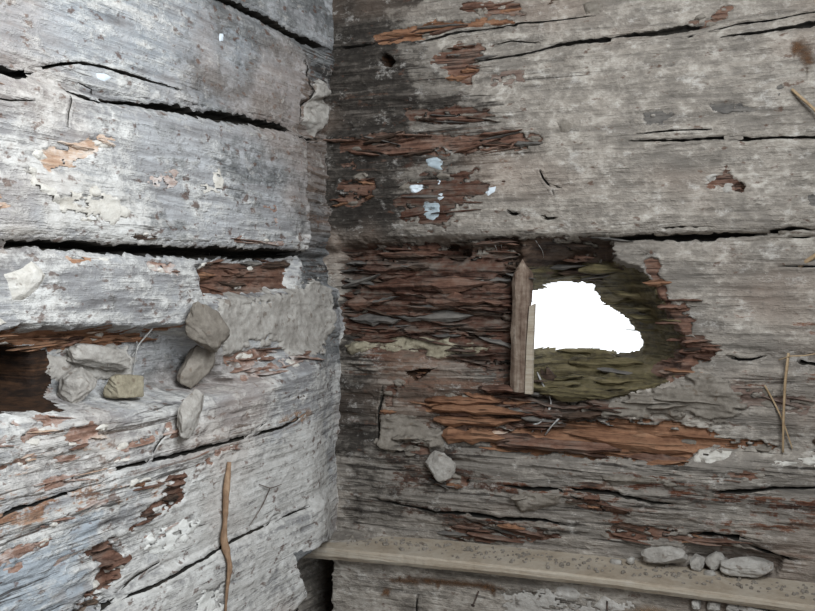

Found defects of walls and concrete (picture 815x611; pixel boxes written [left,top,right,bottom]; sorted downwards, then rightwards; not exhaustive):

crack [0,0,376,147]
crack [406,7,815,66]
peeling [393,157,505,233]
spalling [196,259,291,296]
spalling [528,258,686,403]
spalling [0,319,186,492]
crack [0,410,306,525]
spalling [128,472,188,532]
crack [369,478,677,543]
crack [712,482,815,498]
spalling [76,537,132,606]
crack [91,501,313,611]